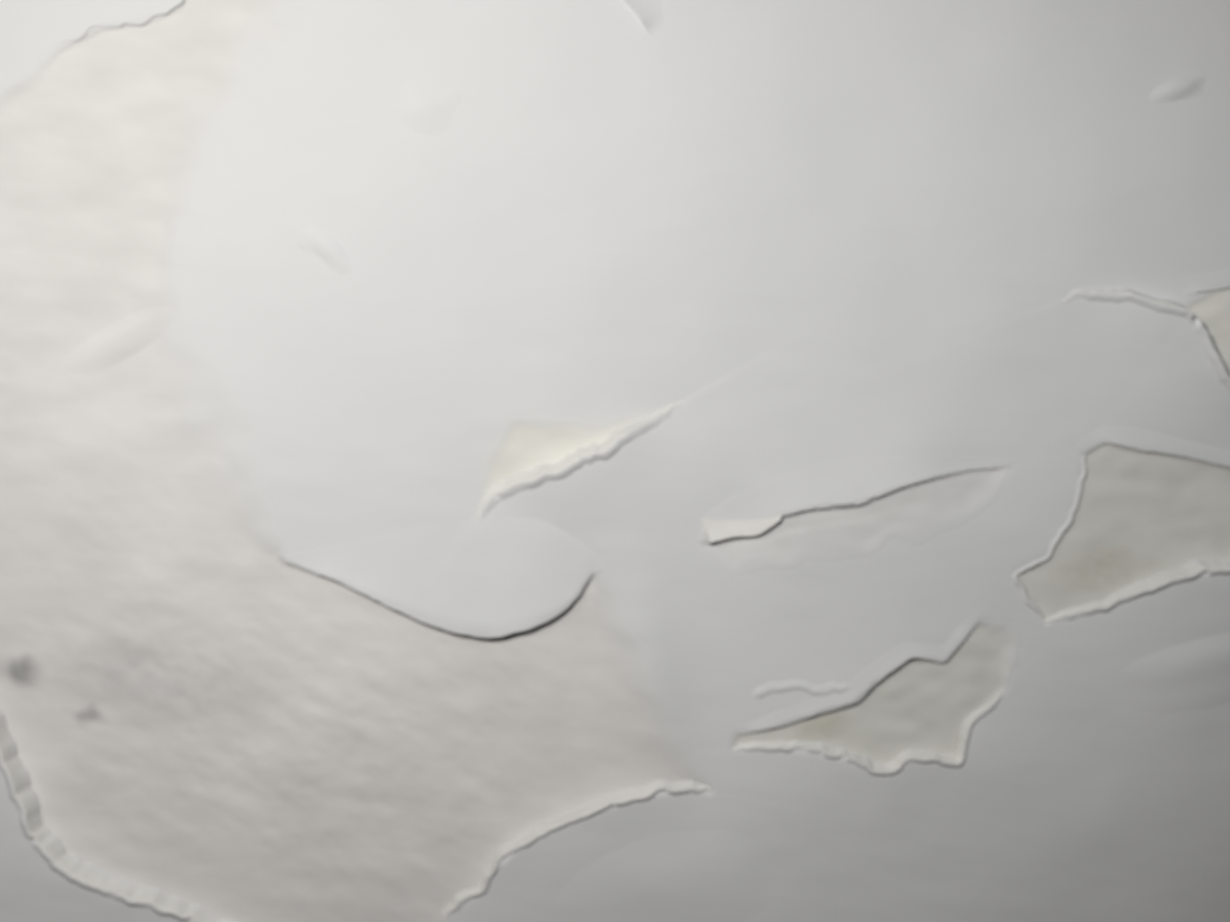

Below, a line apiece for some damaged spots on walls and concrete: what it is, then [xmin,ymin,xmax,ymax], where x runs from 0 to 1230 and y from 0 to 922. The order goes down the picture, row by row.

peeling [1064,268,1230,393]
peeling [0,0,714,922]
peeling [699,455,1013,577]
peeling [1011,426,1230,624]
peeling [731,613,1024,777]